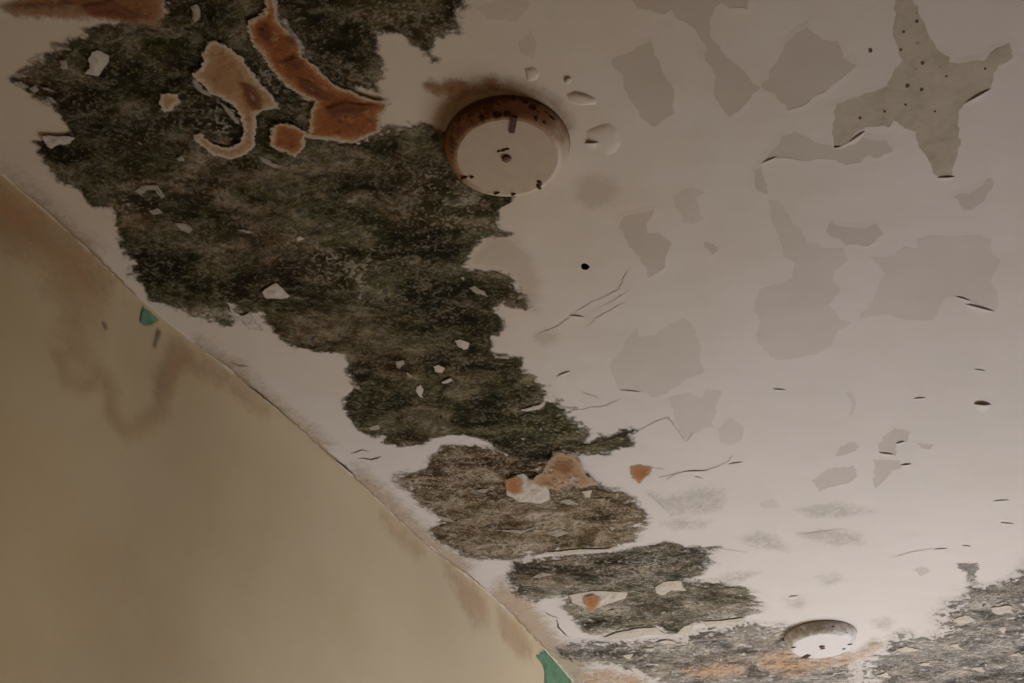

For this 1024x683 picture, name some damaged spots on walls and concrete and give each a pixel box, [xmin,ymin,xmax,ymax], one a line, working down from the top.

corrosion [192,0,391,159]
peeling [755,0,1020,182]
leakage [11,0,638,464]
crack [539,271,628,334]
corrosion [506,452,598,496]
corrosion [630,465,652,483]
crack [657,456,732,481]
leakage [393,445,857,683]
leakage [863,563,1024,683]